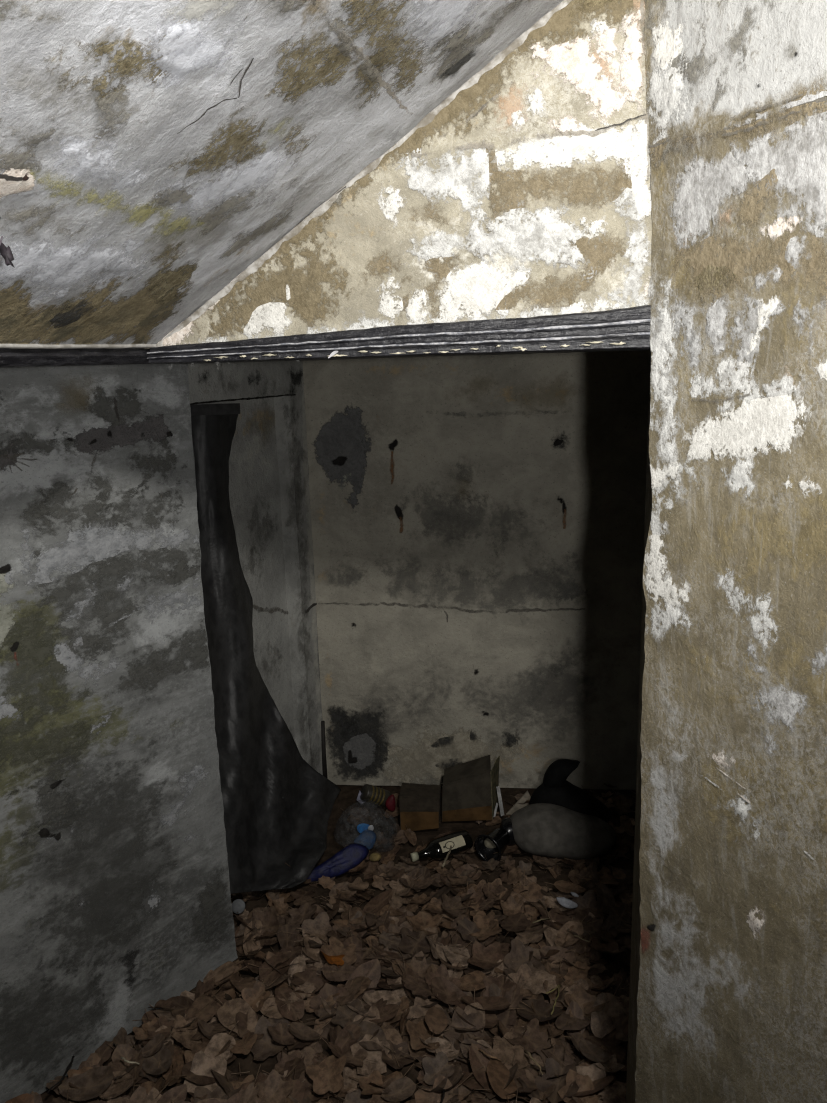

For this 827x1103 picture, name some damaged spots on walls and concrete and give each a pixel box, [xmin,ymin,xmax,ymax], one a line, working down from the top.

crack [314,0,407,110]
crack [177,58,254,134]
flaking render [0,167,35,198]
water stain [196,0,645,343]
peeling [0,233,144,298]
peeling [243,285,292,337]
peeling [377,0,827,640]
water stain [23,436,187,534]
corrosion [389,440,398,484]
corrosion [395,505,403,533]
crack [253,603,585,622]
water stain [0,548,209,772]